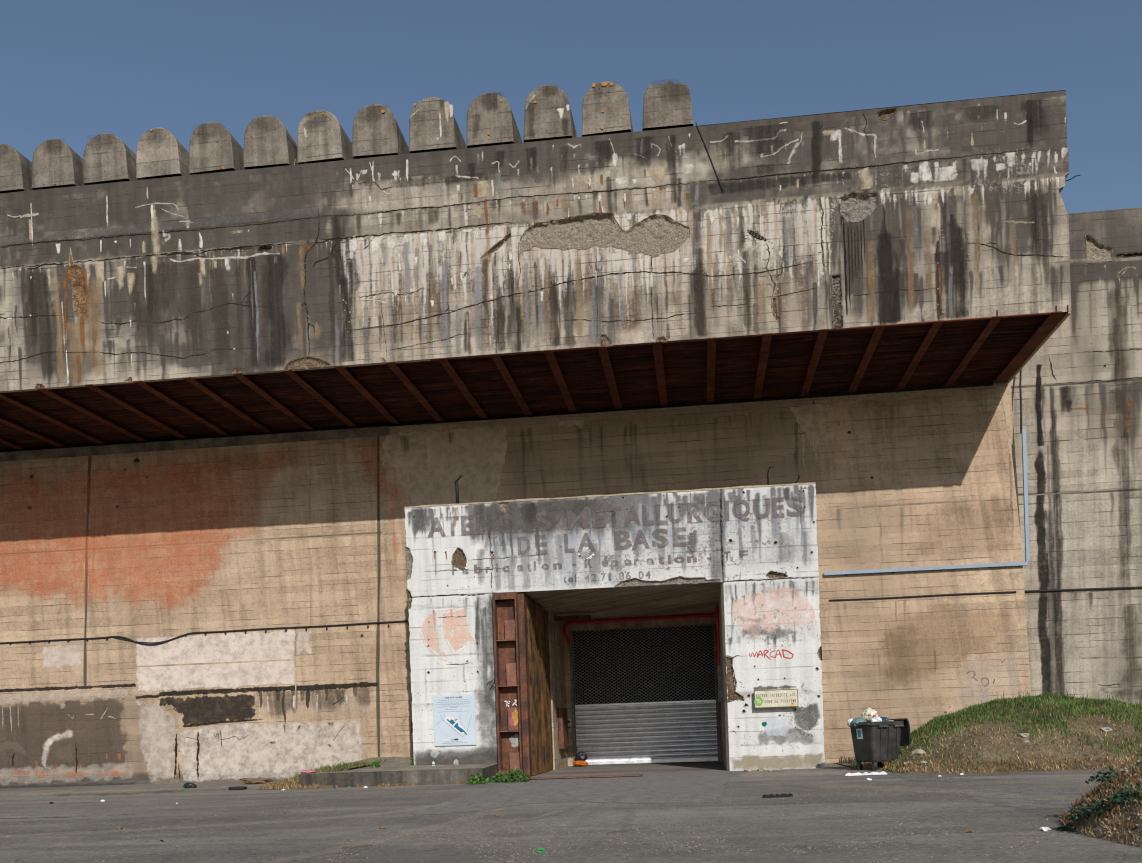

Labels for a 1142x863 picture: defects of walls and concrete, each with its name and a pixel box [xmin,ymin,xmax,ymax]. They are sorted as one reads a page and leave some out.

rust [56,267,100,384]
crack [0,348,253,363]
leakage [49,190,286,366]
leakage [329,209,575,360]
crack [0,149,1035,357]
spalling [479,212,690,260]
leakage [557,105,913,341]
spalling [818,204,843,329]
leakage [911,112,974,318]
spalling [434,548,468,571]
leakage [1035,364,1071,696]
spalling [725,656,751,728]